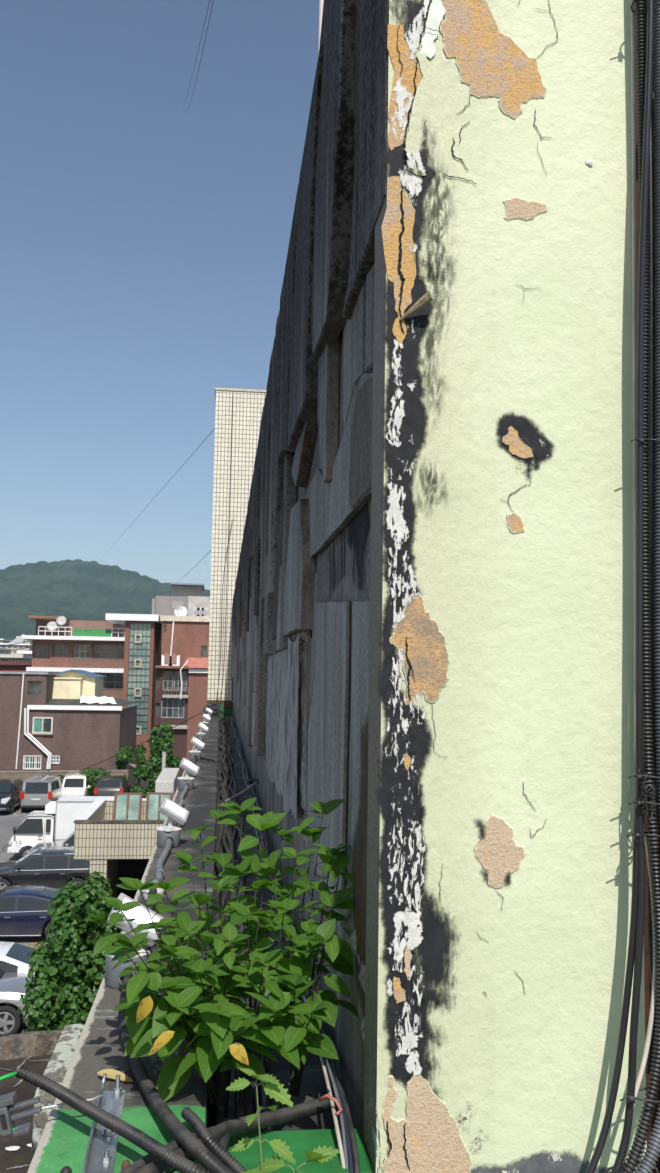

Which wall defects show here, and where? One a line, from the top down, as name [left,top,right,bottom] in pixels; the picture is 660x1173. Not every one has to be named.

crack [518,1,558,59]
crack [442,94,477,184]
leakage [497,413,553,478]
leakage [328,129,455,1097]
spalling [369,0,548,1173]
spalling [333,909,365,993]
leakage [471,1152,610,1173]